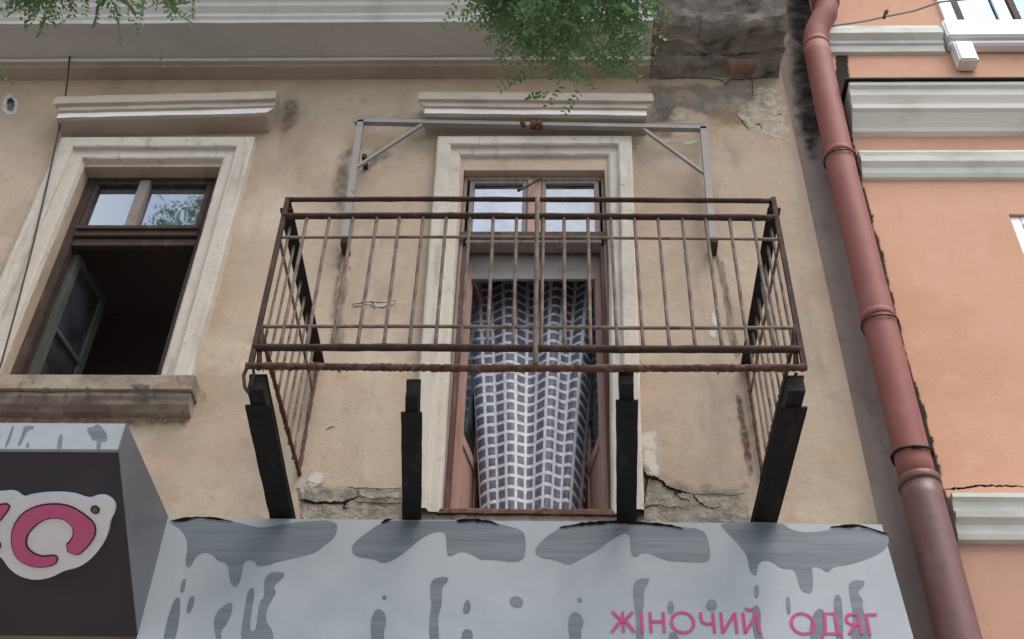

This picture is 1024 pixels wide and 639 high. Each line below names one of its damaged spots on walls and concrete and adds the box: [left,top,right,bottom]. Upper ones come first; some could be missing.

flaking render [726,59,791,145]
rust [737,397,752,471]
spalling [296,471,402,520]
spalling [421,510,617,522]
crack [639,469,743,510]
spalling [637,431,748,523]